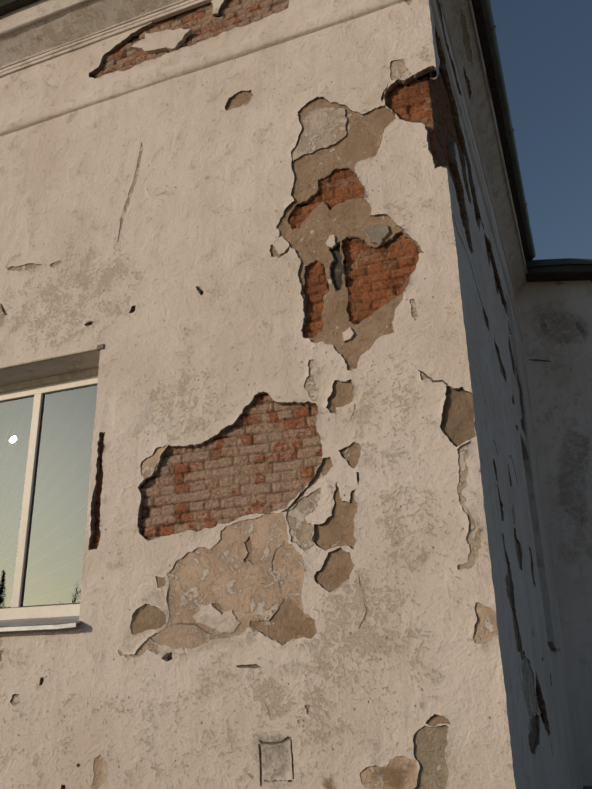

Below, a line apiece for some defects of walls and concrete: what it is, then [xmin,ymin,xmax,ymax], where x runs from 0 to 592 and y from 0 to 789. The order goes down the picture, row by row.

crack [117,142,143,242]
flaking render [88,0,527,662]
crack [453,214,489,331]
peeling [493,459,550,755]
flaking render [360,714,451,789]